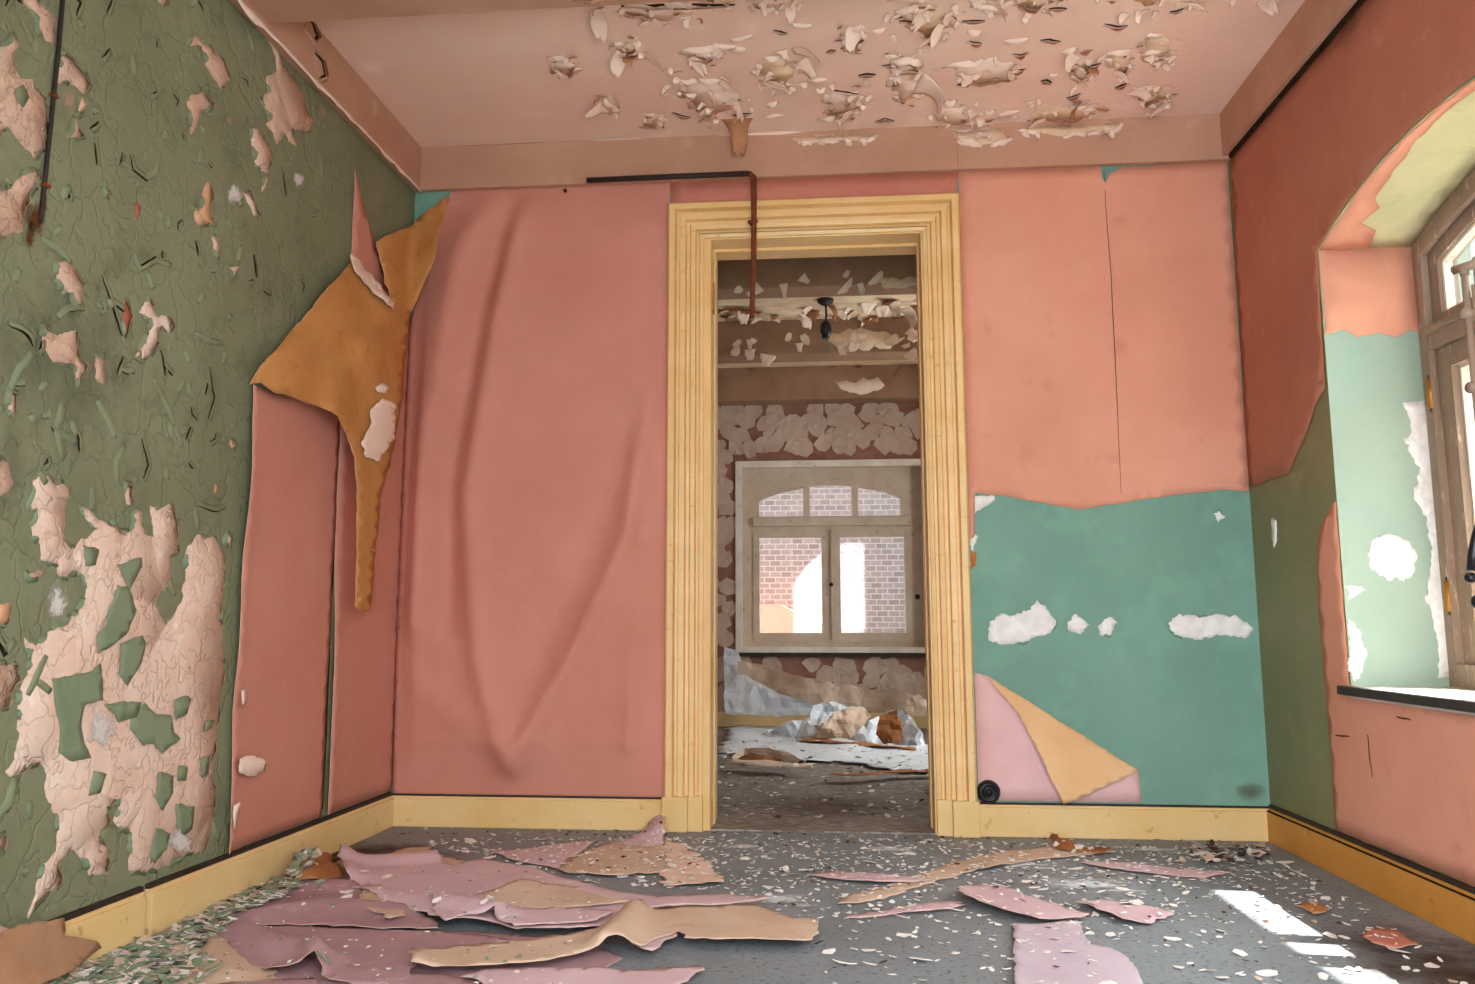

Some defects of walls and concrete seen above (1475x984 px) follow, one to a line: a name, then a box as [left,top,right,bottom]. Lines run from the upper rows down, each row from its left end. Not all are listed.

peeling [0,31,49,241]
peeling [23,0,93,142]
peeling [185,31,232,134]
peeling [243,41,314,219]
peeling [585,0,1209,156]
peeling [39,257,105,389]
peeling [121,294,176,364]
peeling [717,269,927,711]
peeling [0,455,241,919]
flaking render [988,599,1118,646]
flaking render [1166,614,1254,640]
peeling [238,755,267,776]